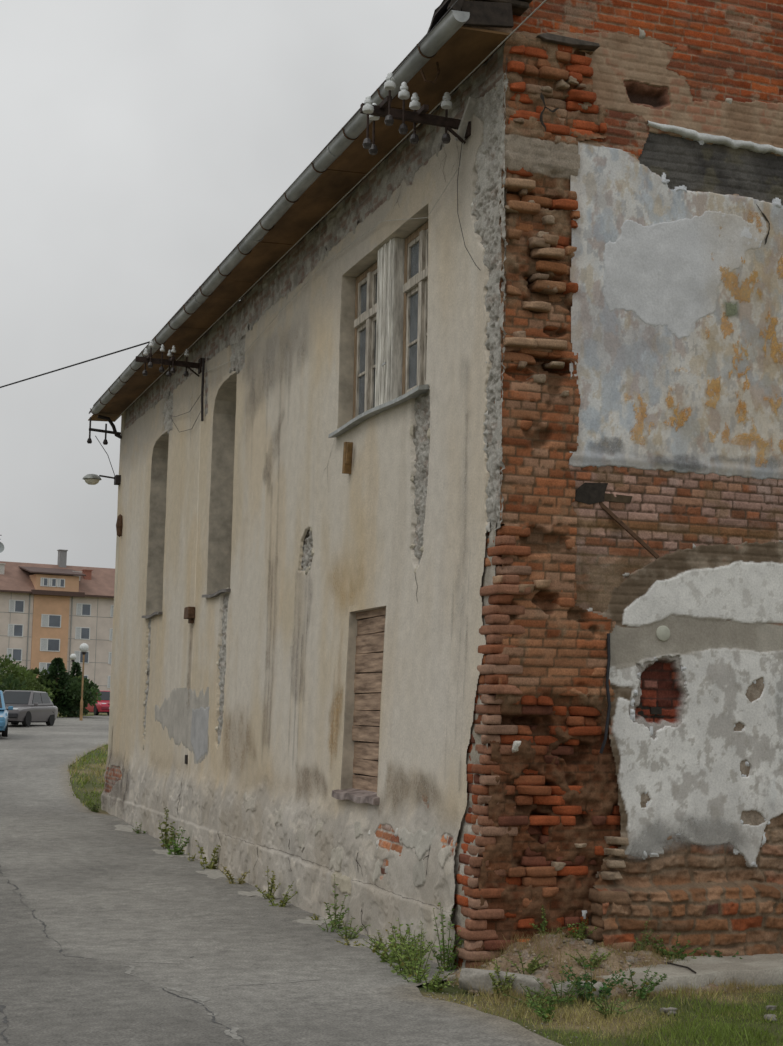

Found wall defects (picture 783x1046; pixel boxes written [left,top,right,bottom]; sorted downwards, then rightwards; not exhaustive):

flaking render [502,0,783,104]
flaking render [598,81,671,158]
peeling [661,173,687,192]
spalling [125,43,508,532]
peeling [721,268,761,302]
peeling [706,316,749,421]
spalling [409,390,430,573]
spalling [301,527,314,575]
flaking render [569,465,783,613]
spalling [629,655,688,740]
flaking render [368,824,403,879]
spalling [593,810,783,956]